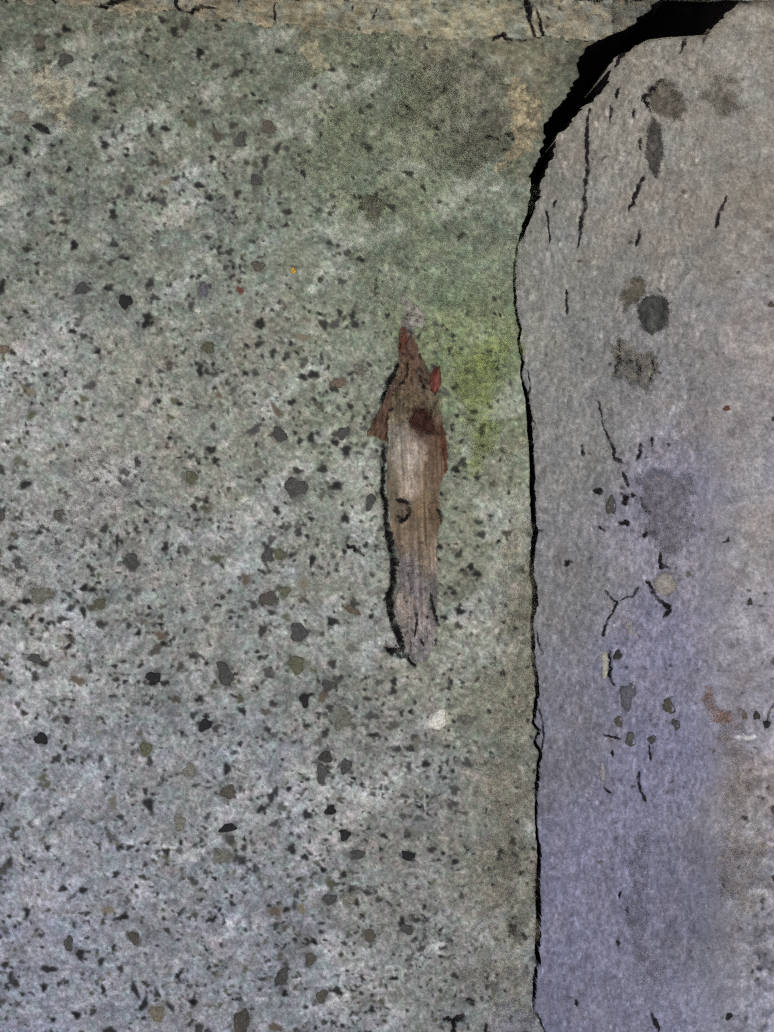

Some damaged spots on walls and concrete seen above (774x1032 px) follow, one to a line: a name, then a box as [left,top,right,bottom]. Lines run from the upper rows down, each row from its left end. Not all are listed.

crack [95,0,126,9]
crack [174,0,239,15]
leakage [402,293,425,327]
crack [381,363,400,402]
crack [443,0,751,1032]
crack [346,443,416,667]